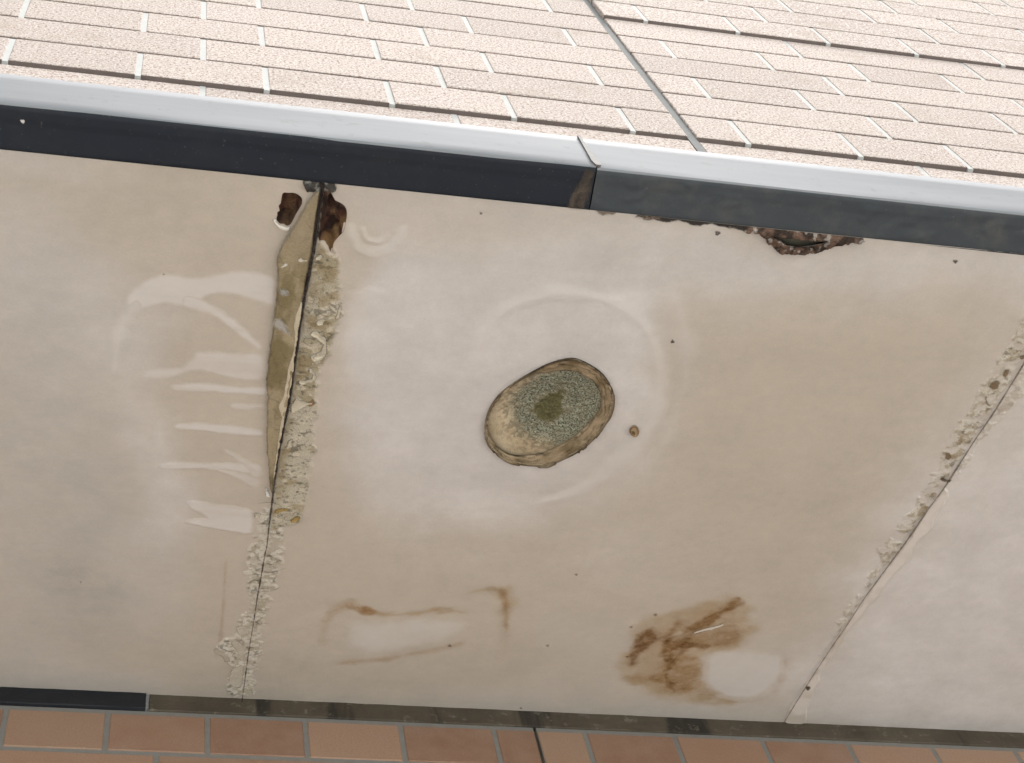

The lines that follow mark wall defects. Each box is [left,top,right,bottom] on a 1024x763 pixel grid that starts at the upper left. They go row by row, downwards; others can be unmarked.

water stain [107,268,278,489]
crack [241,183,325,702]
peeling [254,191,347,531]
rust [699,648,789,701]
spalling [636,215,865,255]
crack [784,363,1024,722]
peeling [817,314,1024,657]